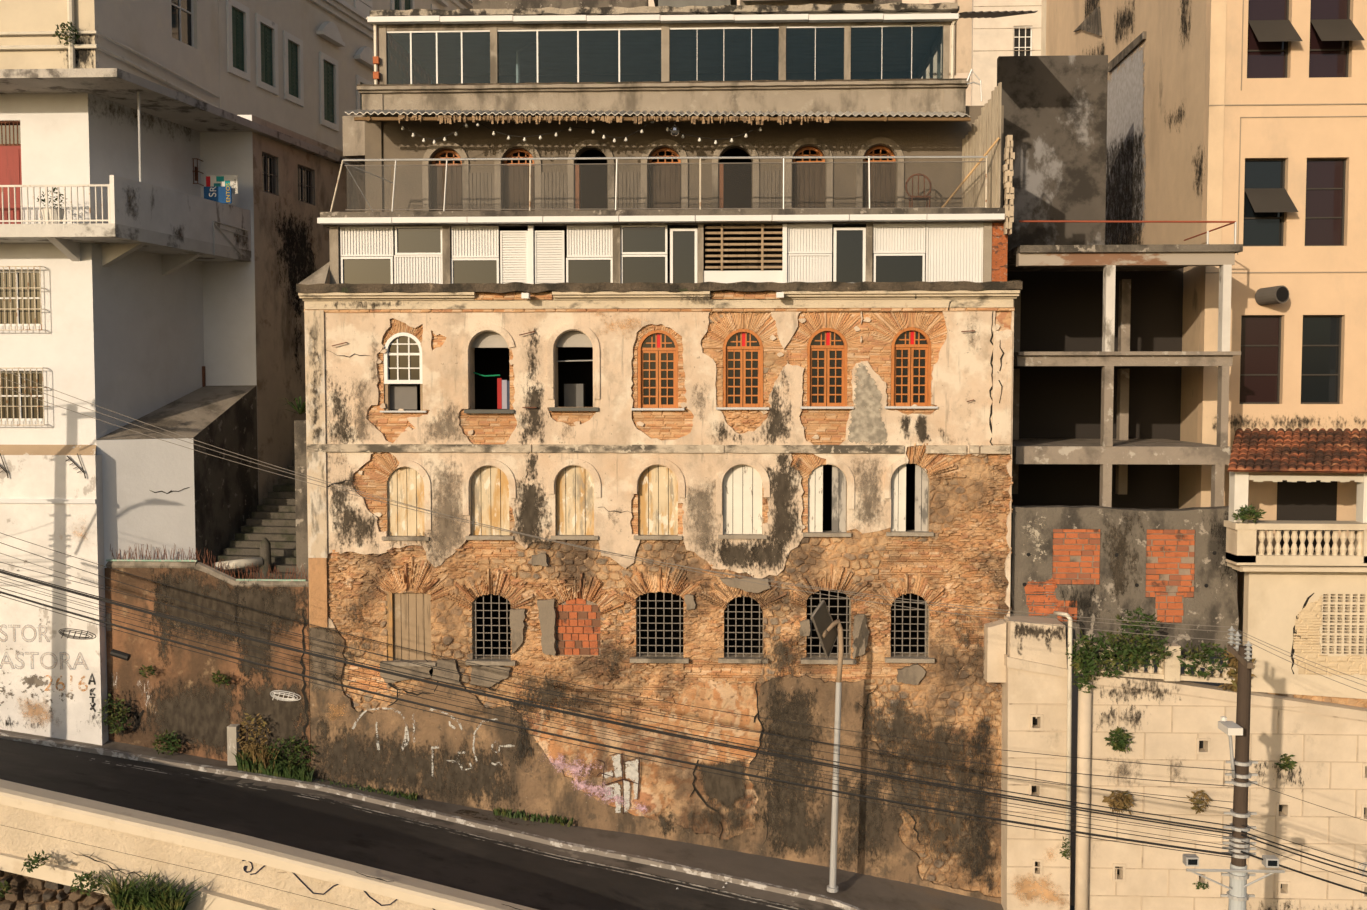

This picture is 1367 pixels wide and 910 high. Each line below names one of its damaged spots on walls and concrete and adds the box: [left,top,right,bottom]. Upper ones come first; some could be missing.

mould [1084,0,1135,43]
leakage [330,471,464,565]
leakage [513,328,551,548]
leakage [688,370,801,572]
flaking render [327,311,1063,904]
flaking render [1293,595,1367,676]
peeling [0,672,75,721]